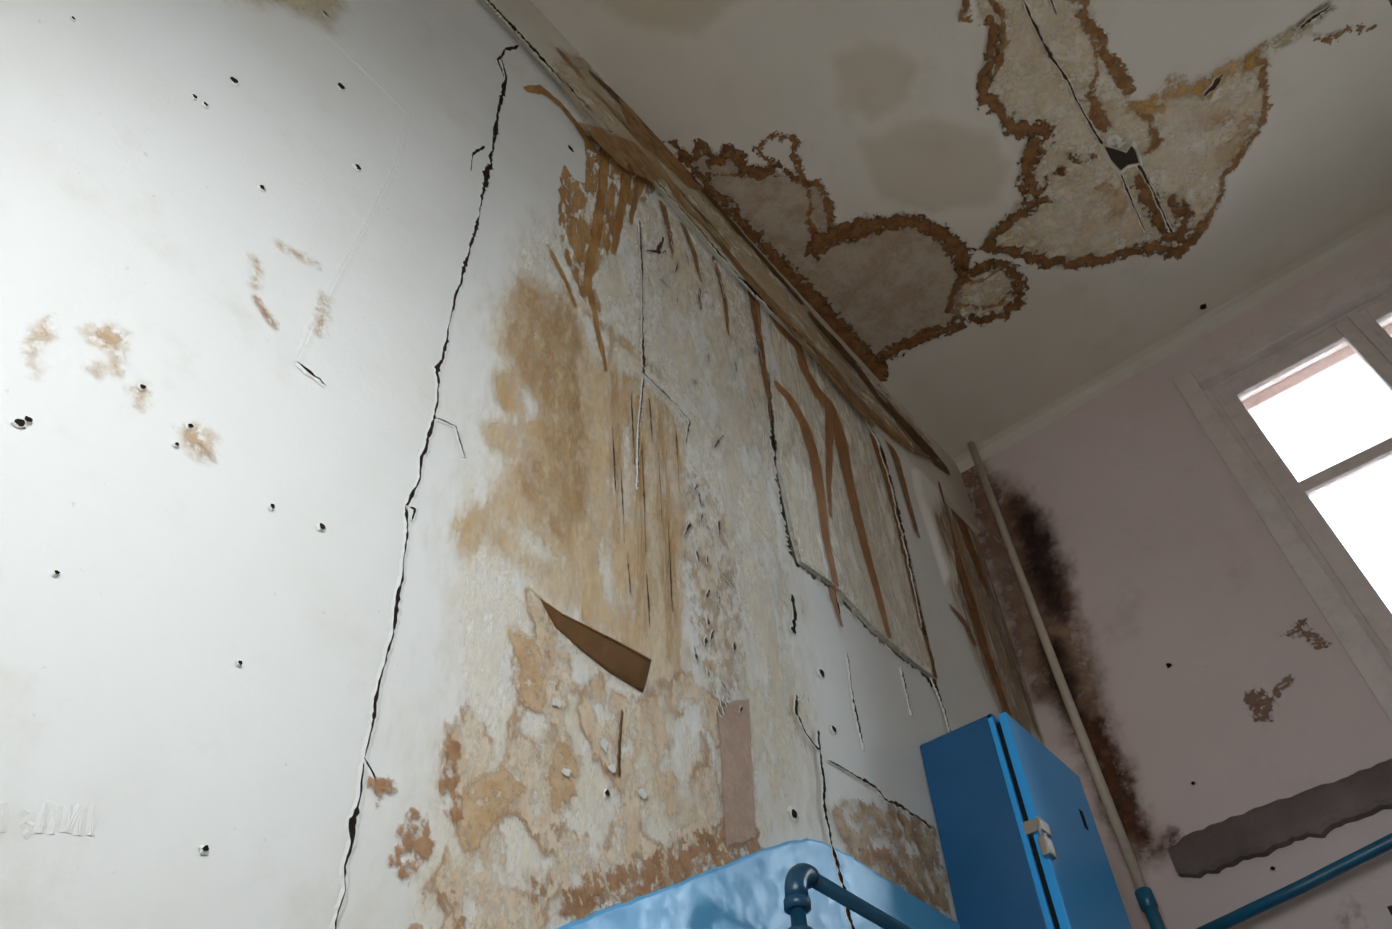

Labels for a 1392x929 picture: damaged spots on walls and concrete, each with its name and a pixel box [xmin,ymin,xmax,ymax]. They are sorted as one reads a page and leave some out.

crack [1023,0,1104,145]
crack [1202,74,1224,97]
spalling [1097,134,1143,176]
crack [1119,165,1173,233]
crack [330,0,842,929]
damp [524,0,1273,862]
peeling [389,200,798,929]
crack [766,372,951,929]
spalling [1243,674,1294,722]
spalling [1286,618,1332,650]
peeling [367,776,397,807]
peeling [833,799,951,918]